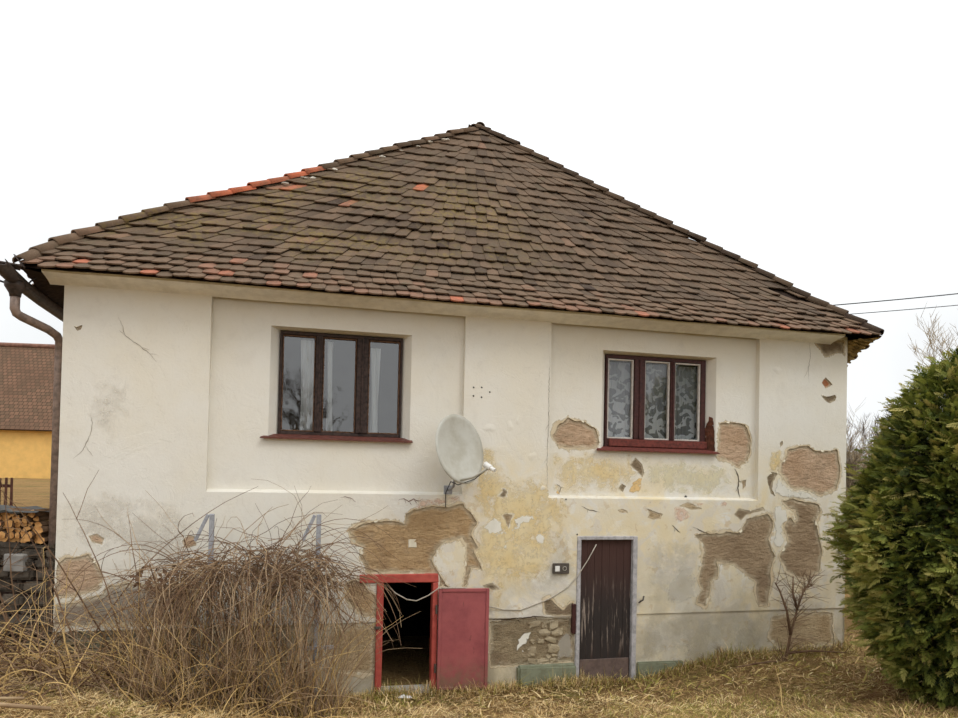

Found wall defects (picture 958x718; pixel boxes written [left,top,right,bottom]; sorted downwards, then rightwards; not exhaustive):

spalling [821,378,836,403]
spalling [551,416,644,500]
spalling [704,417,752,468]
spalling [647,509,663,520]
spalling [695,440,842,652]
spalling [327,501,534,679]
flaking render [489,595,575,668]